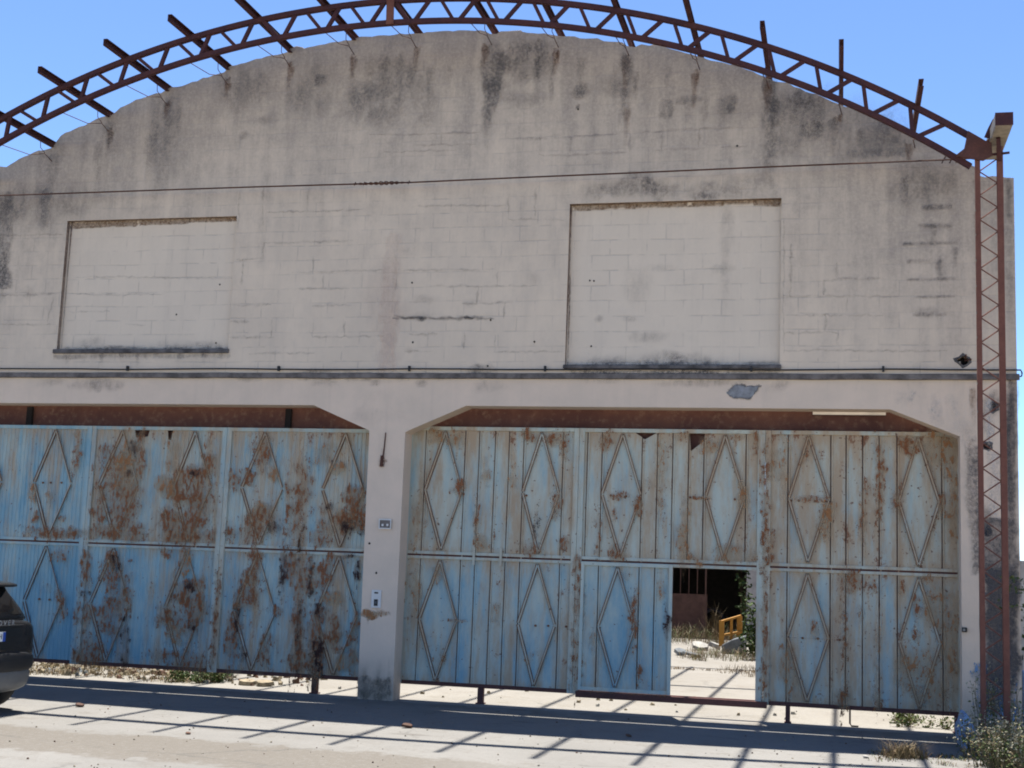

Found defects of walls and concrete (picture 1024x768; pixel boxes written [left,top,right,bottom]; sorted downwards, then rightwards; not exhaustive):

rust [16,422,389,692]
rust [521,427,570,469]
rust [559,535,596,708]
rust [671,431,809,719]
spalling [727,384,760,399]
rust [835,559,885,726]
rust [858,429,959,539]
rust [872,574,960,718]
damp [975,395,1023,713]